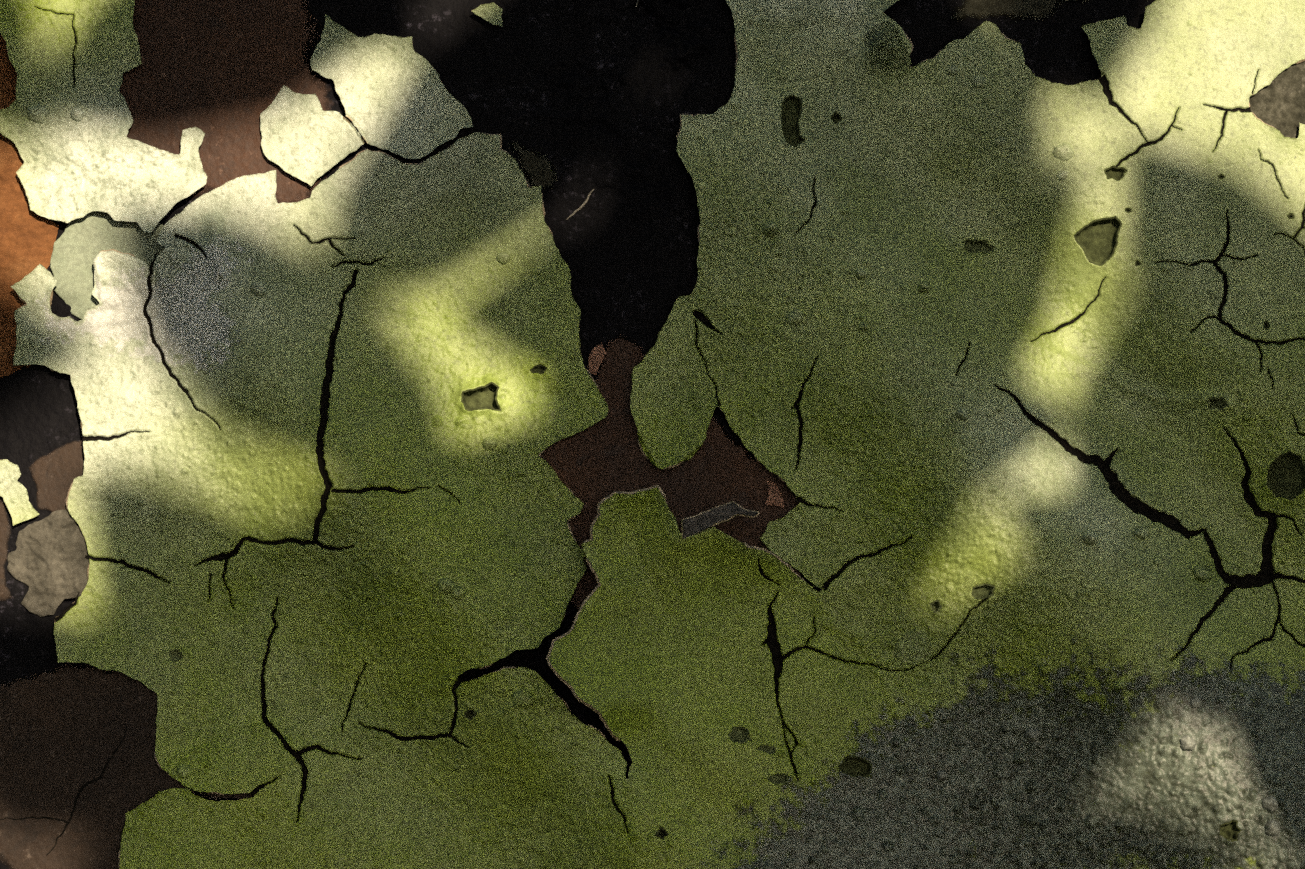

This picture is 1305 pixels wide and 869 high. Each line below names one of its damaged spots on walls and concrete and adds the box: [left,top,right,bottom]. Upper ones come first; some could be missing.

peeling [0,0,207,378]
peeling [119,0,365,203]
crack [1098,69,1259,167]
crack [1156,149,1305,389]
peeling [0,459,39,526]
spalling [0,502,90,617]
peeling [0,664,190,869]
crack [82,224,460,608]
crack [251,598,469,822]
peeling [540,336,799,552]
crack [758,537,989,780]
crack [995,385,1305,668]